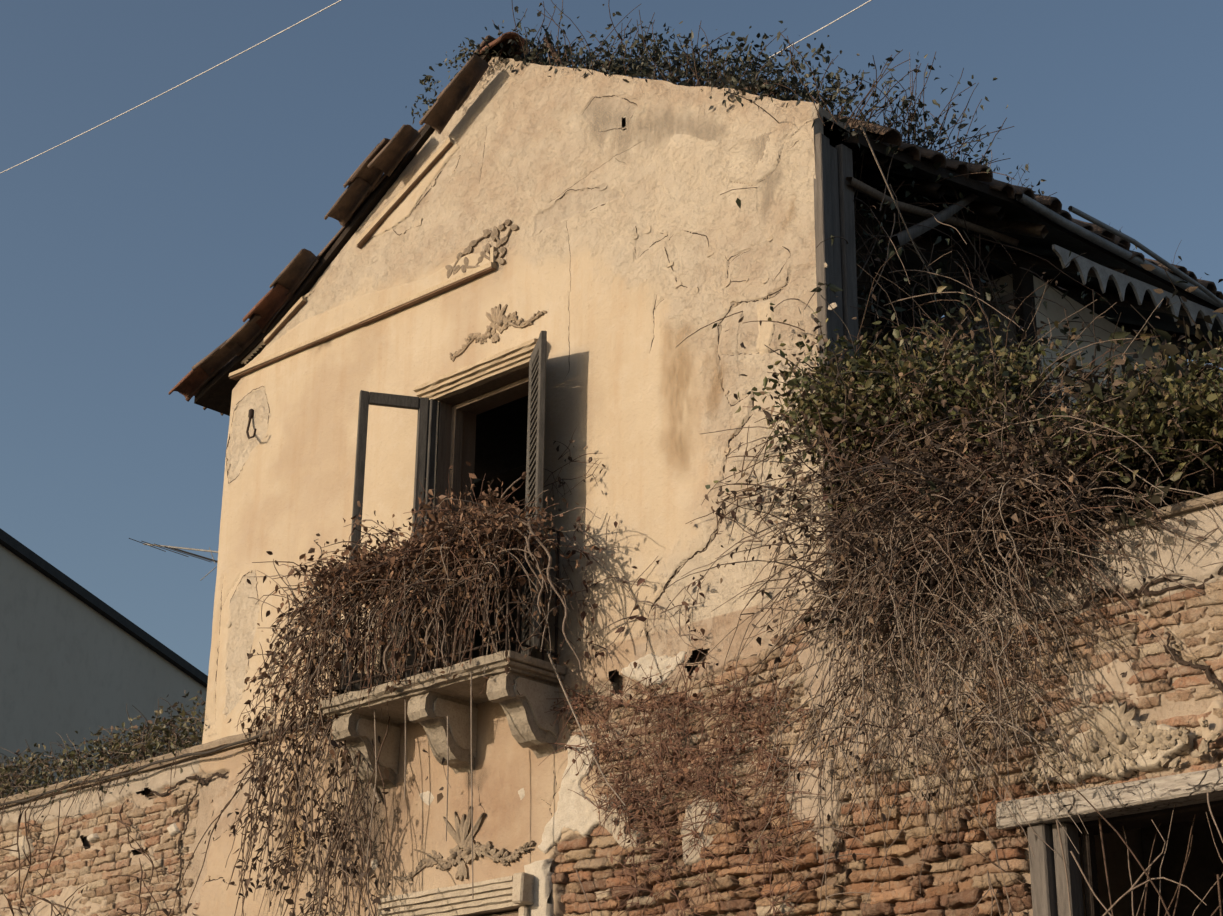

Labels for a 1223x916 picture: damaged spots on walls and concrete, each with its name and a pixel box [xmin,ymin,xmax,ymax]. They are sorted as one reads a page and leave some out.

crack [550,139,647,379]
crack [634,226,674,261]
peeling [225,386,271,484]
crack [639,250,800,642]
peeling [222,569,260,718]